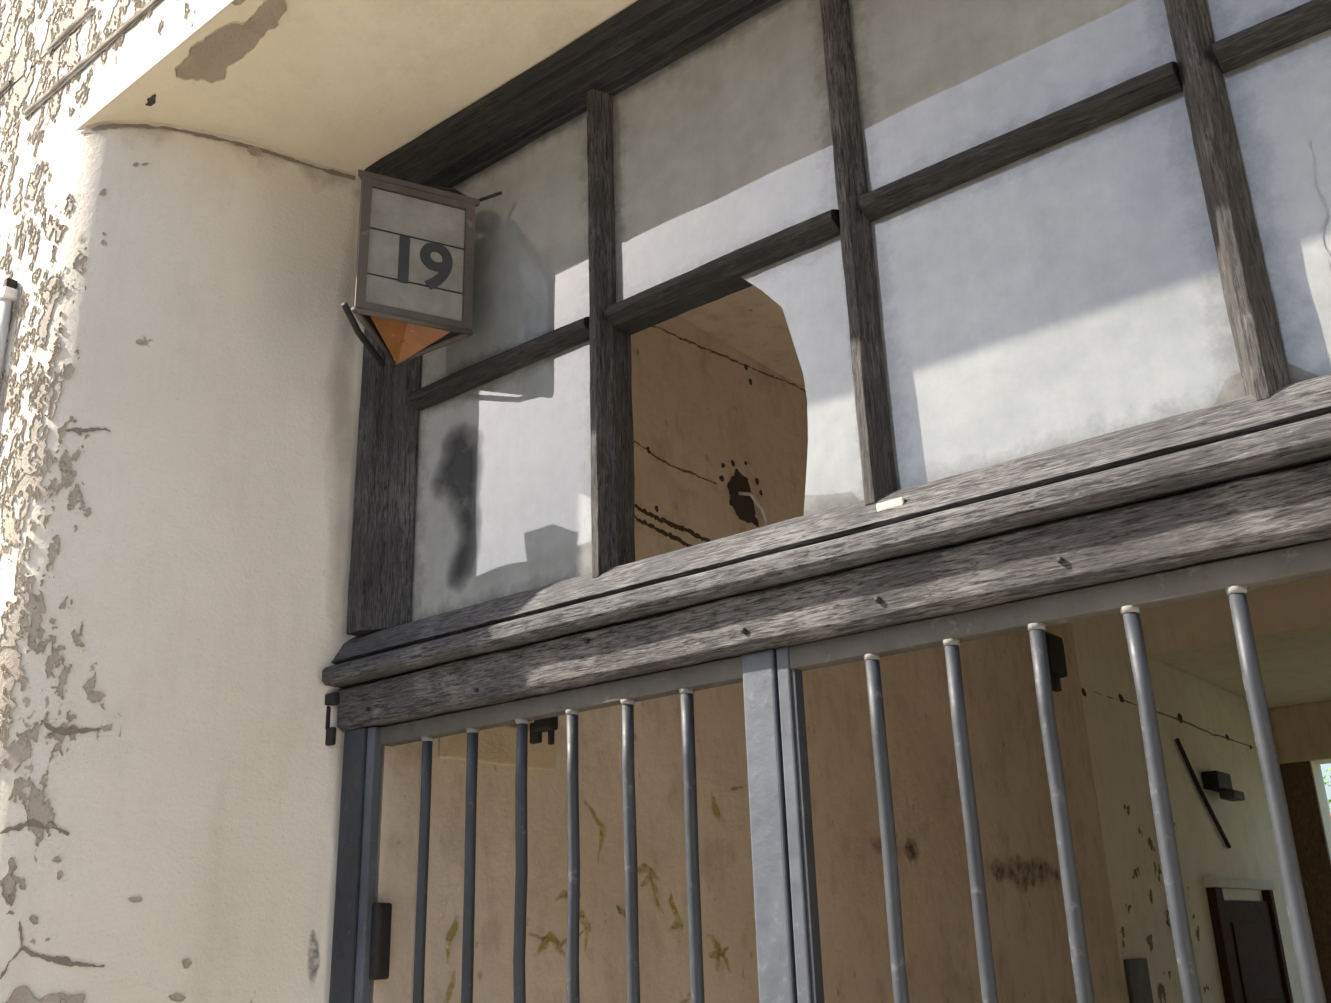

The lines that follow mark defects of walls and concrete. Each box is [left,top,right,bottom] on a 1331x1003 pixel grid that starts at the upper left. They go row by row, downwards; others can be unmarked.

spalling [175,0,286,83]
peeling [0,0,205,880]
crack [0,922,105,979]
peeling [5,986,86,1003]